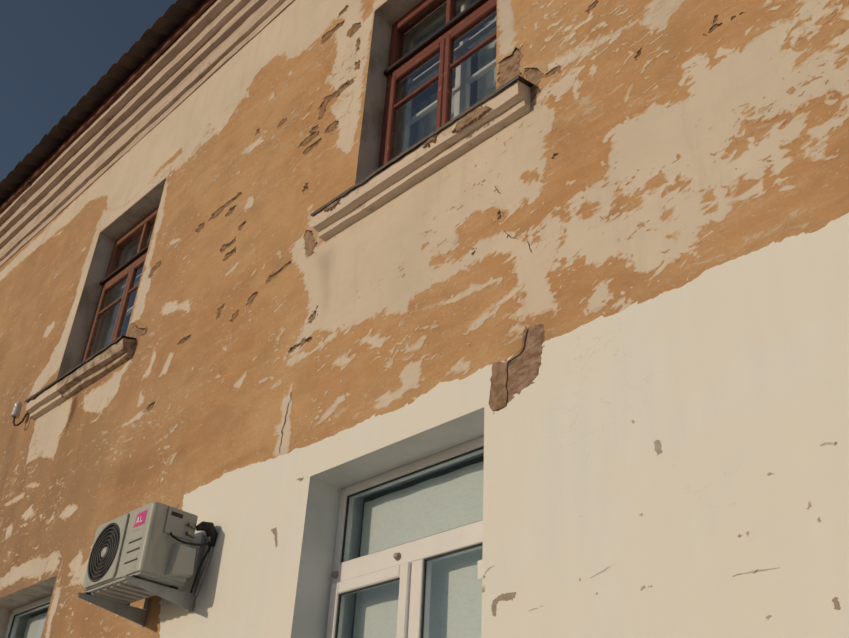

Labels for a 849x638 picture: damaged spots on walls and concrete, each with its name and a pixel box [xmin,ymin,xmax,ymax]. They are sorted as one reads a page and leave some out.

peeling [0,0,387,638]
peeling [191,0,849,457]
peeling [491,592,517,617]